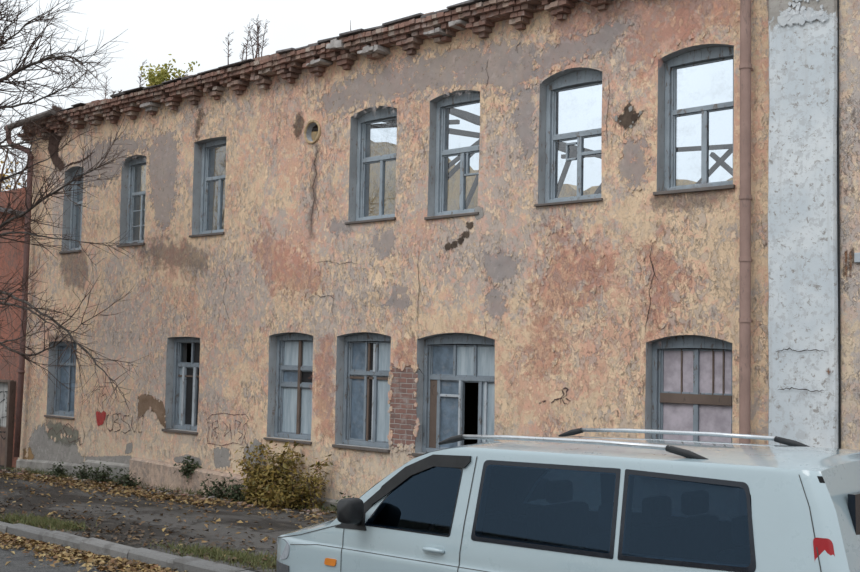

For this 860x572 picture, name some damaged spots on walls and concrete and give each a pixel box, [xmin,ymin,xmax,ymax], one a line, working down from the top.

peeling [767,0,829,33]
peeling [317,17,636,173]
peeling [614,101,655,195]
spalling [445,206,484,250]
crack [645,243,657,326]
spalling [25,421,133,465]
spalling [136,391,166,429]
spalling [387,361,420,455]